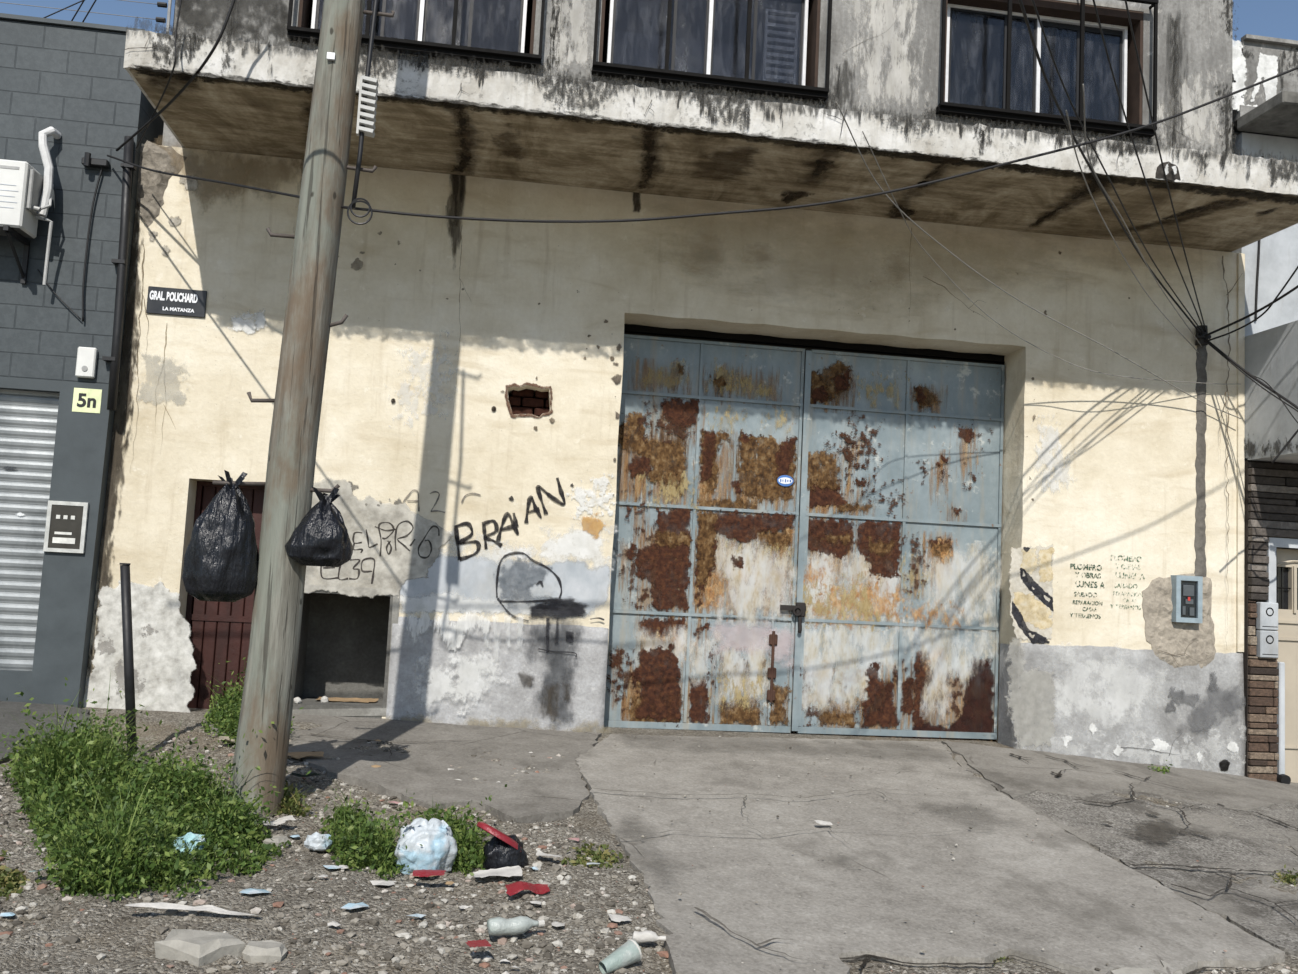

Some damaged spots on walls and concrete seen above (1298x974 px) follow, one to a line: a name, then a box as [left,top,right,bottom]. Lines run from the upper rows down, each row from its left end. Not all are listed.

water stain [126,0,319,127]
water stain [358,0,1298,255]
spalling [491,376,555,430]
water stain [1244,434,1298,461]
peeling [304,478,538,614]
corrosion [606,358,999,740]
peeling [1005,636,1056,751]
crack [594,788,1007,845]
crack [1010,738,1298,922]